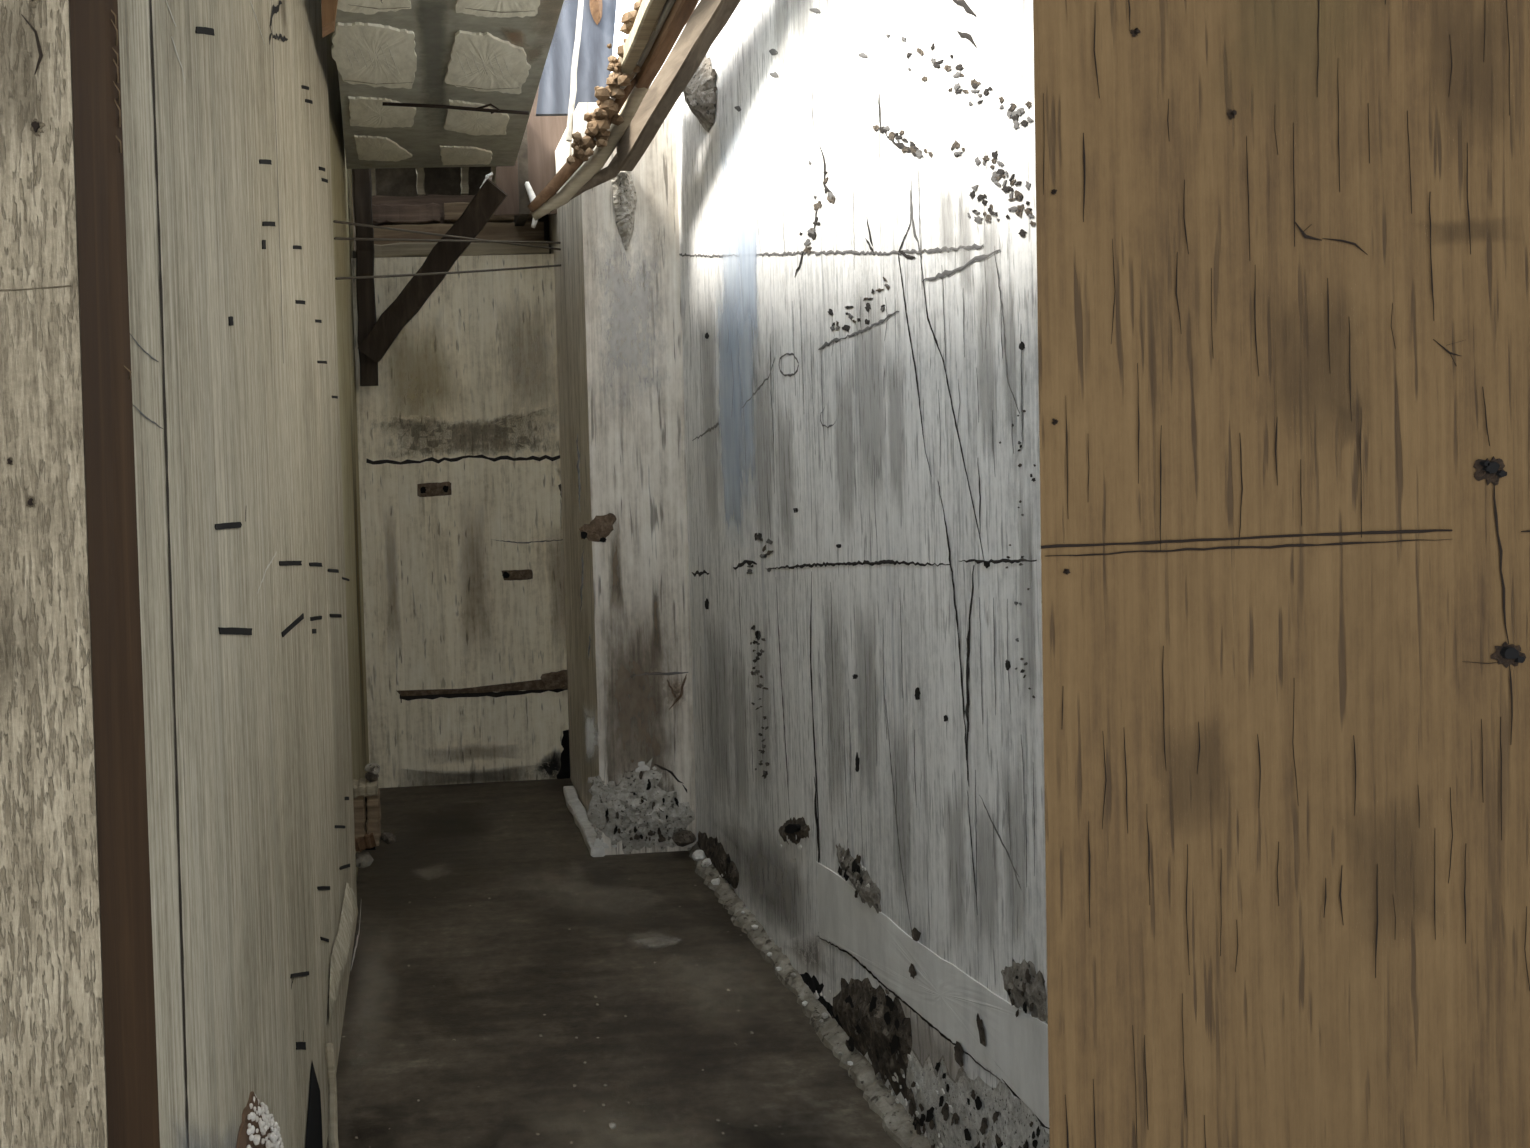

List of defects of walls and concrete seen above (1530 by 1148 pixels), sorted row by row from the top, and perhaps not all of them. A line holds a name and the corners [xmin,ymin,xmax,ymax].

damp [383,348,549,457]
damp [718,163,756,520]
crack [1327,278,1362,538]
crack [689,80,1035,915]
crack [1239,417,1302,541]
spalling [587,758,739,889]
crack [1257,700,1298,802]
crack [1350,735,1358,816]
crack [1418,484,1513,944]
crack [1324,864,1396,978]
spalling [1001,957,1048,1024]
spalling [800,972,1050,1148]